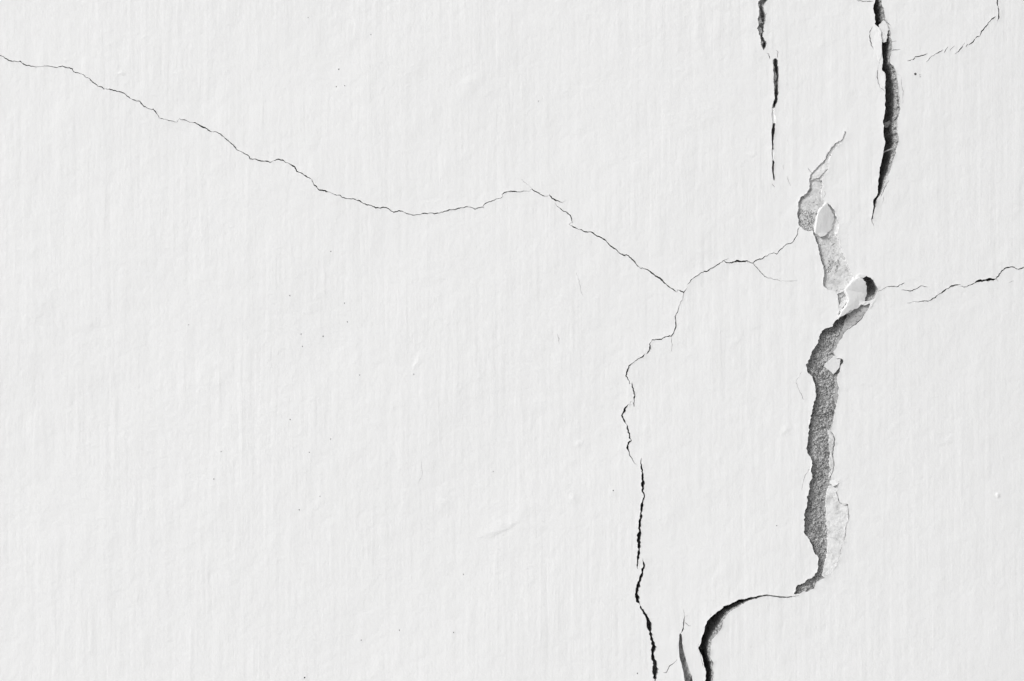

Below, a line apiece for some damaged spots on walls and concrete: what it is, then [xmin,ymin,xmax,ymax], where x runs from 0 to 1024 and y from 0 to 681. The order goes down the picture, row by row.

crack [757,0,790,186]
crack [857,0,1000,225]
crack [0,55,799,681]
flaking render [794,131,879,594]
crack [878,266,1024,302]